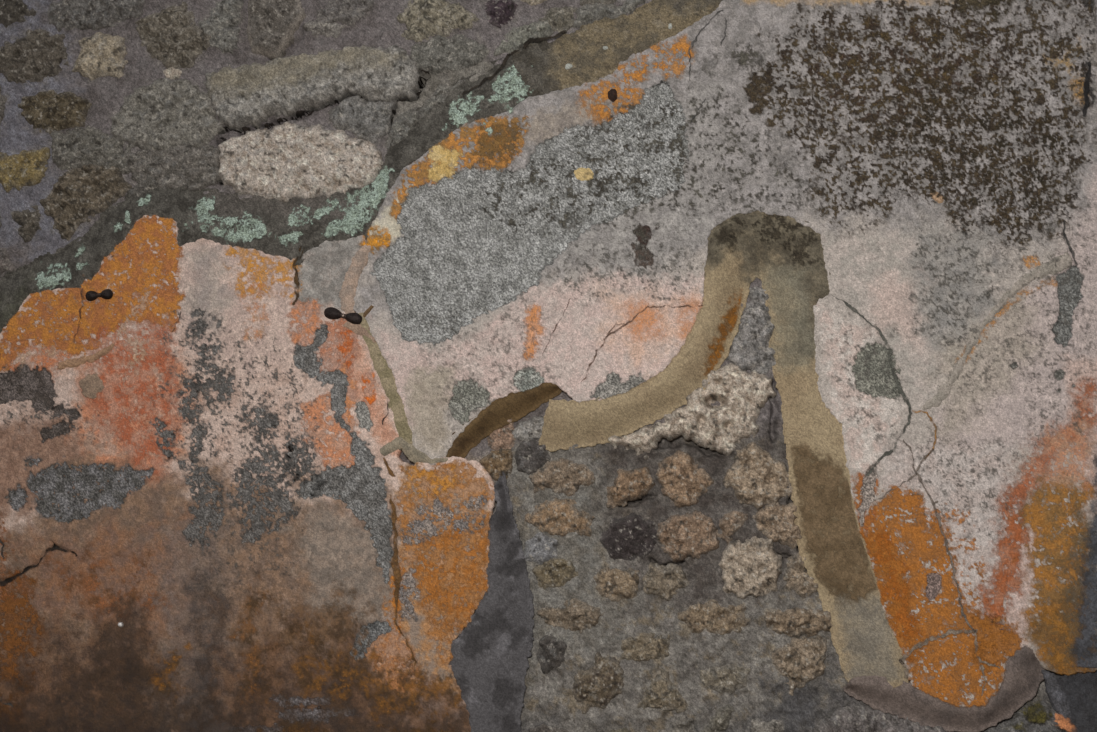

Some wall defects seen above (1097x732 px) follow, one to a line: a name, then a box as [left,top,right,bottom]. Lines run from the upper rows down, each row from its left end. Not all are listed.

spalling [370,81,690,345]
spalling [513,367,544,391]
spalling [590,371,646,401]
crack [836,298,1000,695]
crack [0,540,77,586]